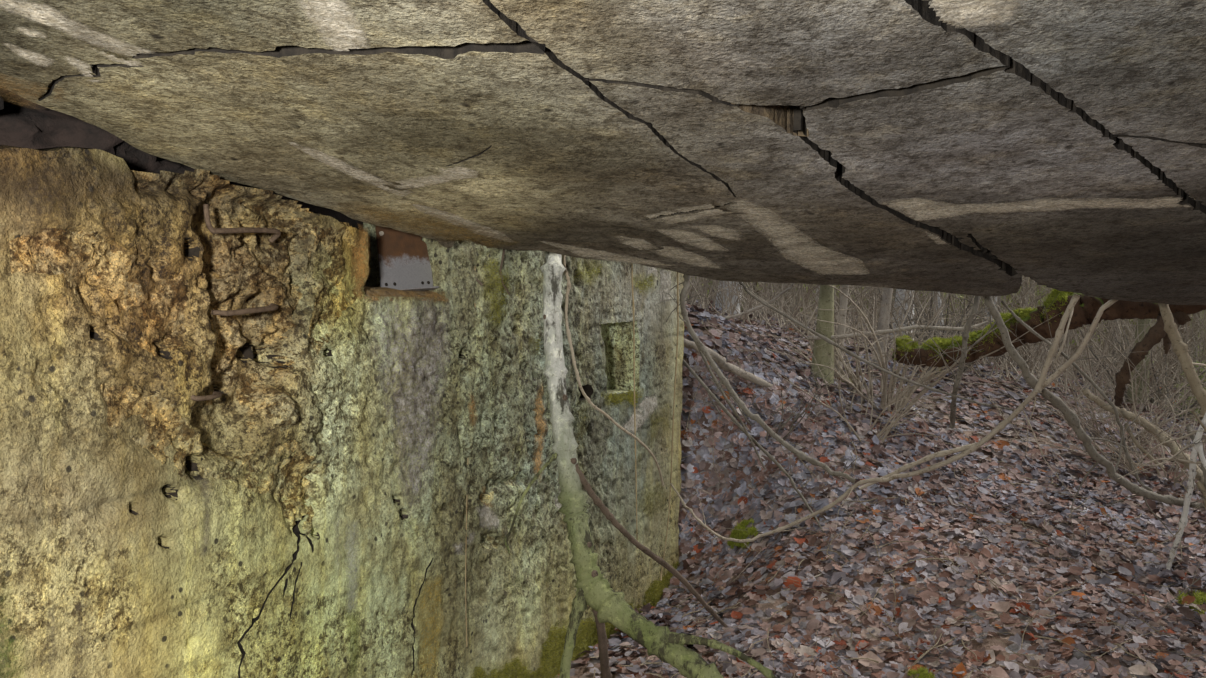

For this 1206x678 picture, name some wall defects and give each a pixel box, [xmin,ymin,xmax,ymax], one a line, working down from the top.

crack [38,0,739,220]
crack [793,0,1206,276]
spalling [8,227,189,359]
corrosion [353,229,367,293]
crack [237,515,314,678]